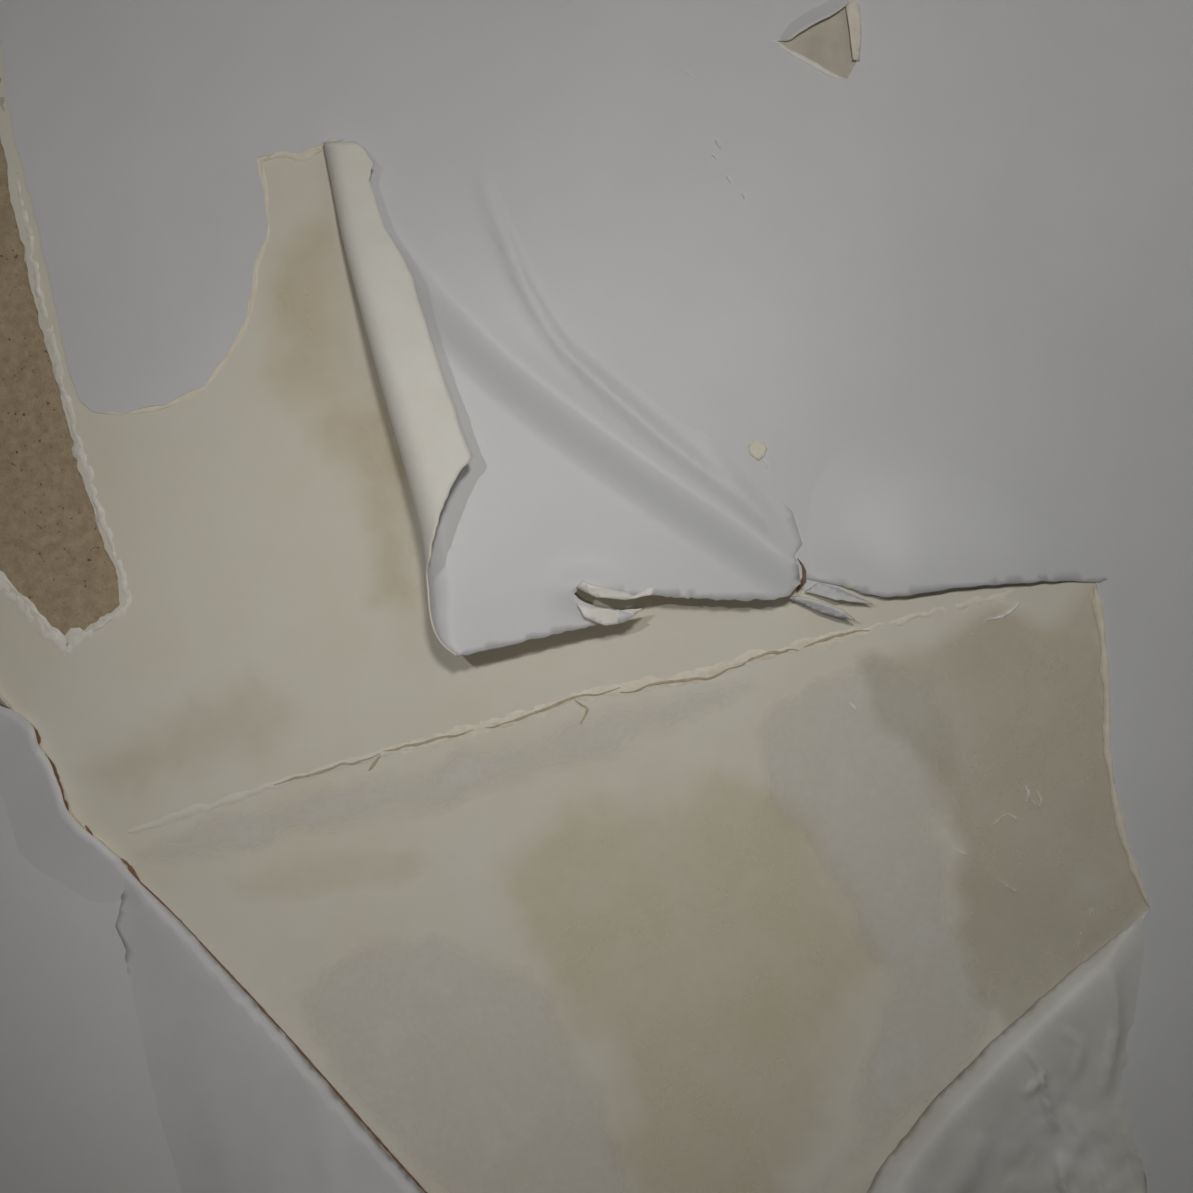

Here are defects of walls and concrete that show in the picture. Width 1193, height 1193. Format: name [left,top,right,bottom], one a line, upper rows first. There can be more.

peeling [771,0,862,81]
peeling [0,706,136,903]
peeling [323,138,802,657]
crack [127,587,1029,834]
peeling [560,716,633,754]
peeling [796,559,806,592]
peeling [784,596,855,621]
peeling [767,664,984,1121]
peeling [806,433,1107,597]
peeling [115,878,428,1193]
peeling [317,941,615,1193]
peeling [867,909,1149,1193]